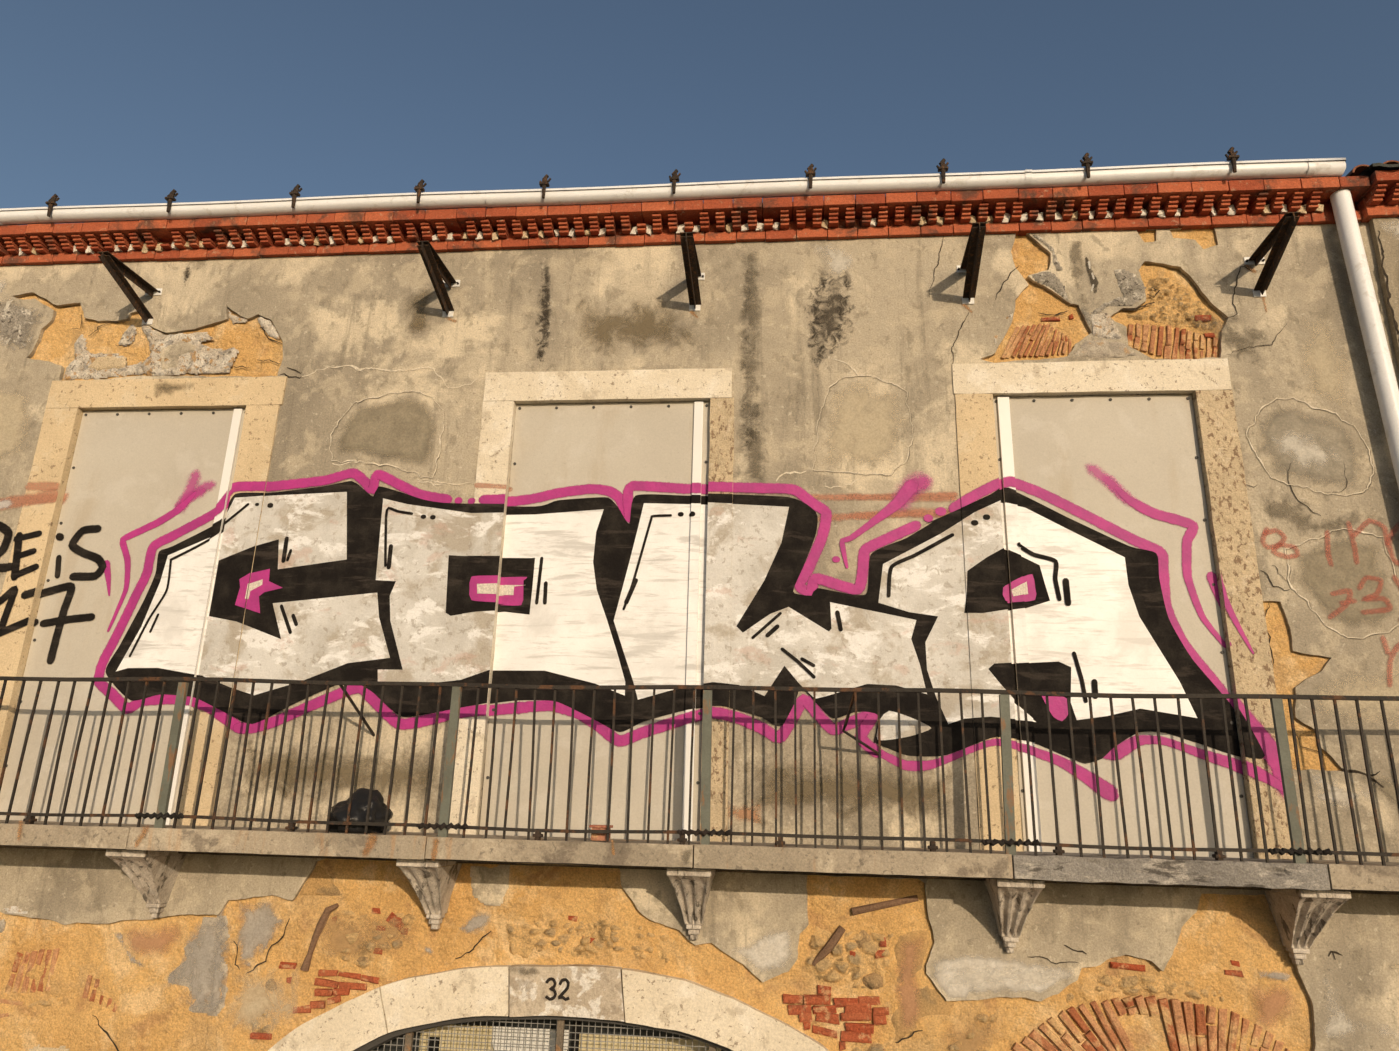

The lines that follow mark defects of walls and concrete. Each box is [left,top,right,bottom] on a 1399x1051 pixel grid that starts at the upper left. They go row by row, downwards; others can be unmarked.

spalling [1138,229,1217,249]
spalling [0,284,283,380]
leakage [808,248,850,356]
spalling [983,234,1090,363]
spalling [1111,264,1227,359]
crack [776,471,876,488]
spalling [1263,602,1342,771]
spalling [0,859,1313,1051]